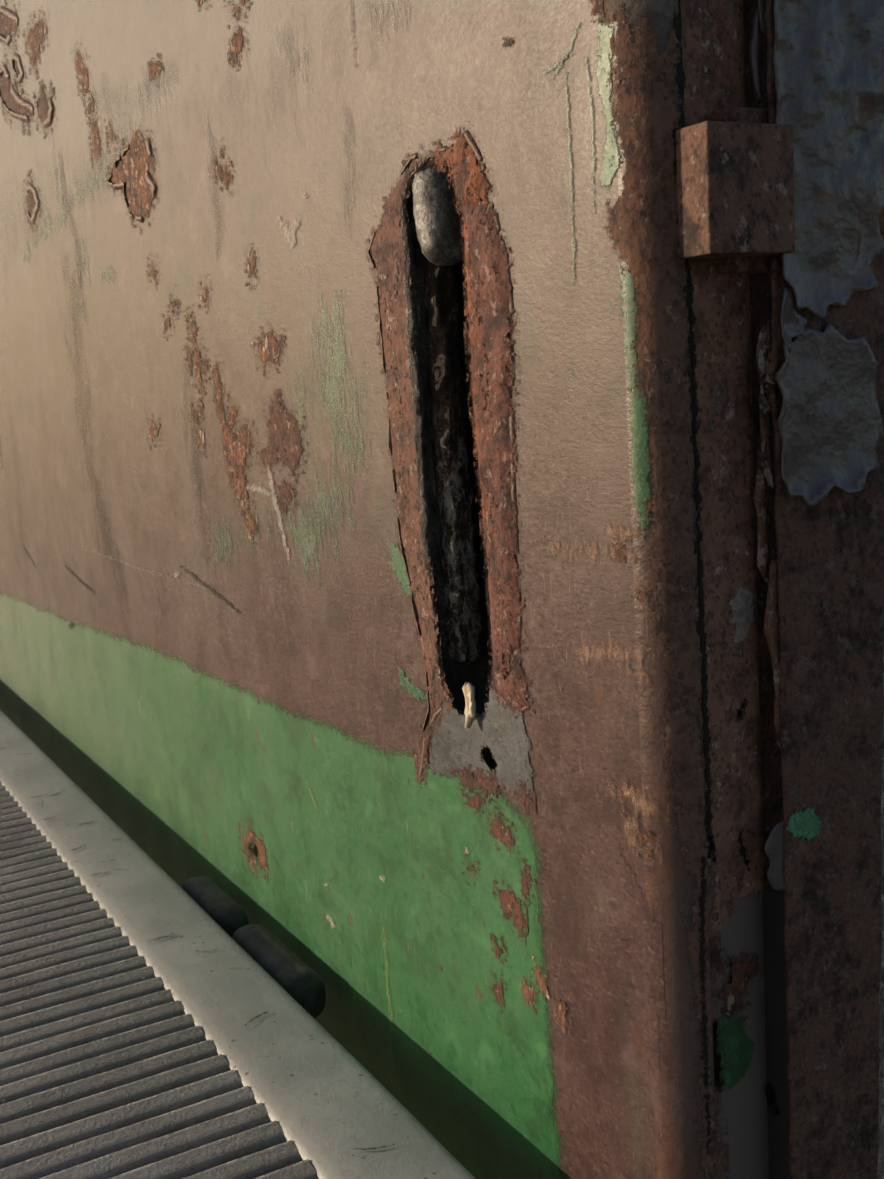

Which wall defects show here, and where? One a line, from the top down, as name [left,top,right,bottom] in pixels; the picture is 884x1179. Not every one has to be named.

corrosion [0,0,57,138]
corrosion [148,52,164,86]
corrosion [223,0,251,71]
corrosion [242,242,258,291]
corrosion [161,274,308,544]
corrosion [365,121,534,789]
corrosion [555,0,822,1179]
corrosion [238,819,268,883]